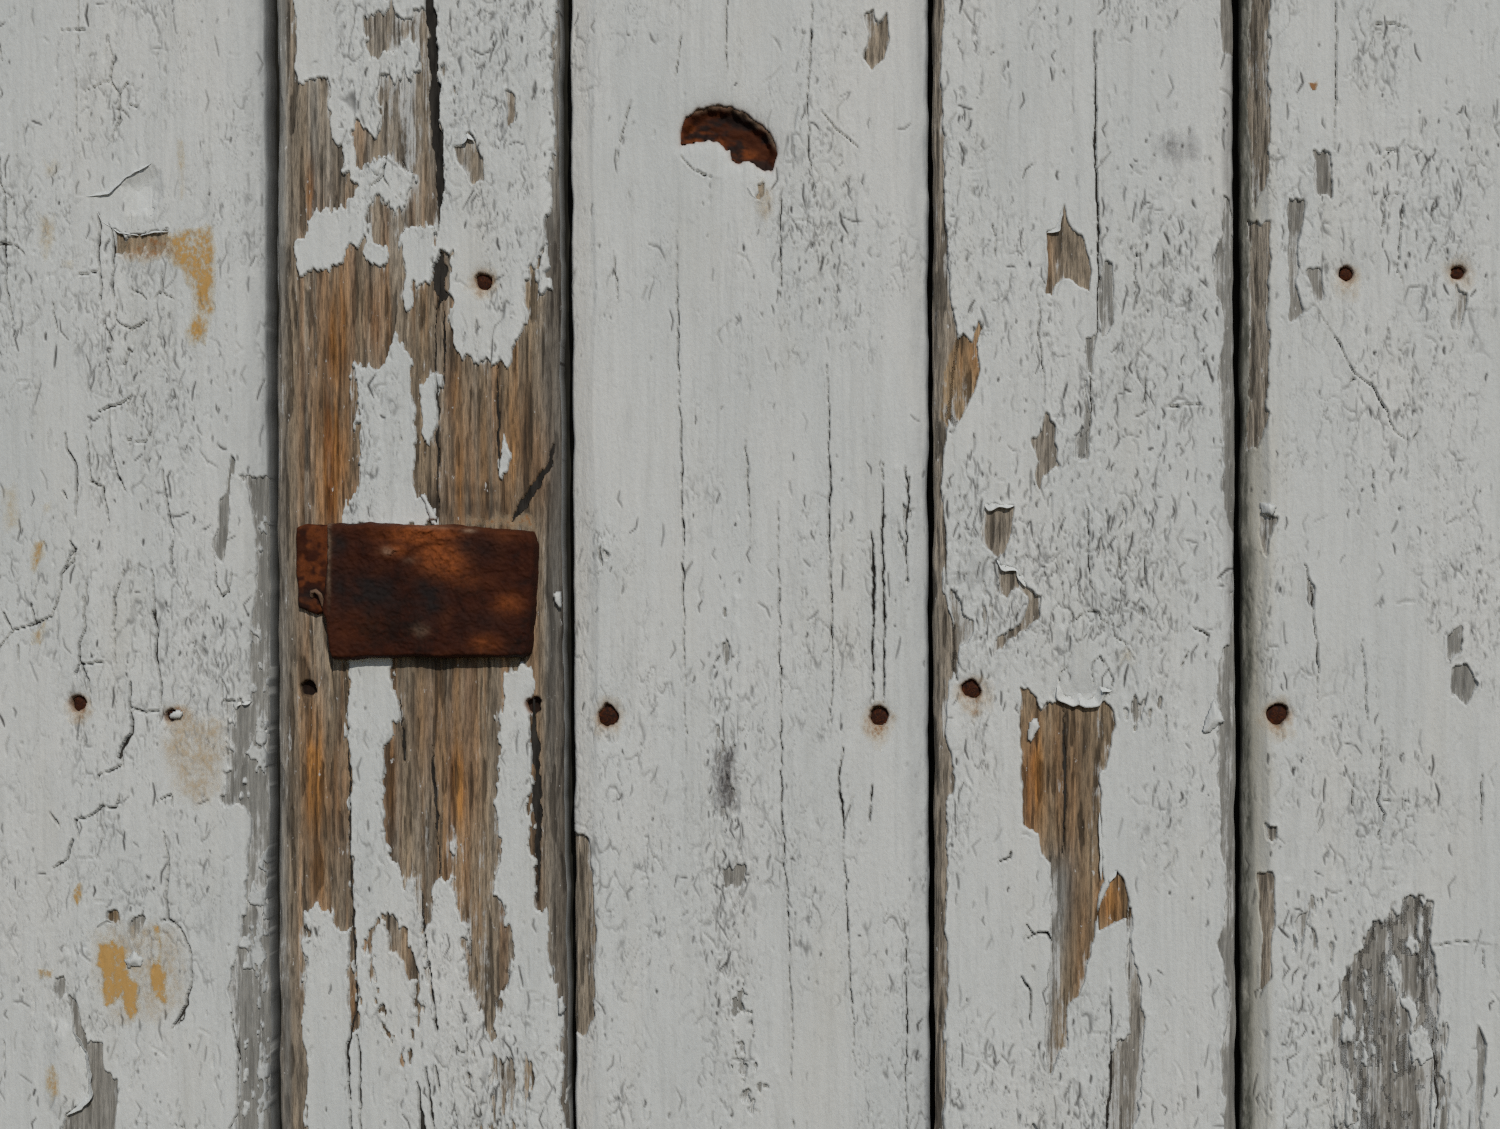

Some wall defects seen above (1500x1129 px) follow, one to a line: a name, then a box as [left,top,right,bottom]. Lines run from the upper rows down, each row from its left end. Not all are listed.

crack [95,221,116,299]
peeling [1045,207,1113,459]
peeling [213,0,597,1129]
peeling [1031,413,1059,489]
peeling [54,977,118,1129]
crack [58,611,163,866]
peeling [97,909,146,969]
crack [165,919,193,1024]
peeling [1020,685,1167,1129]
peeling [1202,574,1236,1129]
peeling [1257,871,1275,989]
peeling [1329,895,1453,1129]